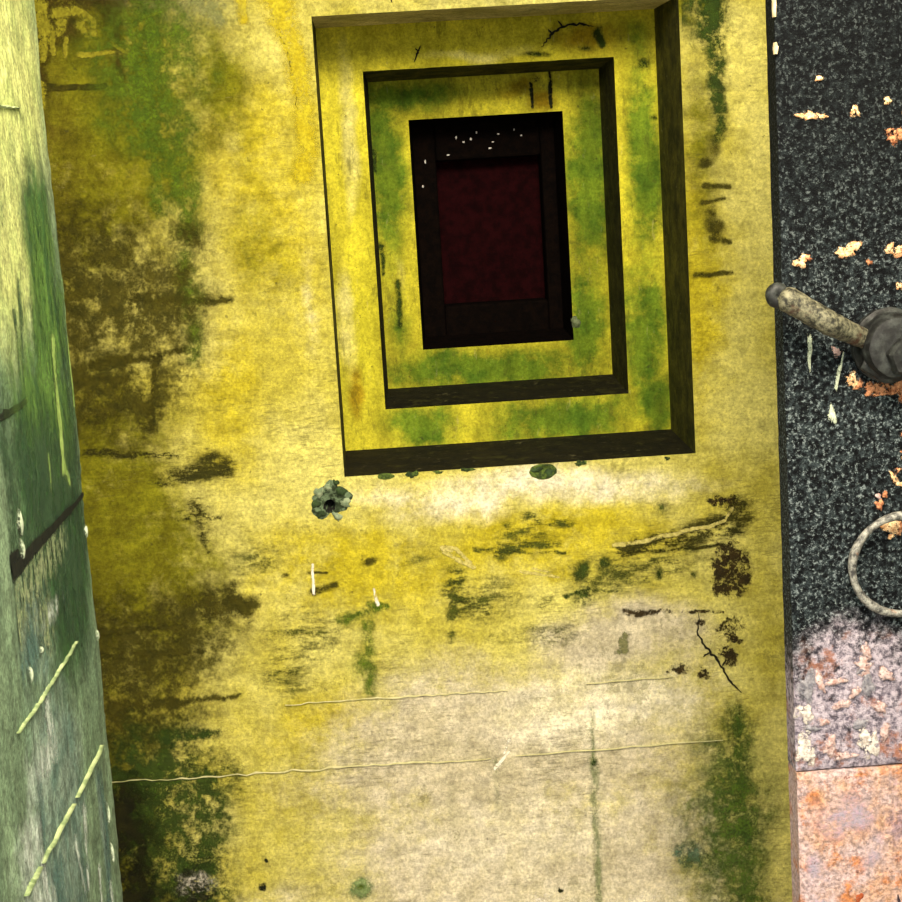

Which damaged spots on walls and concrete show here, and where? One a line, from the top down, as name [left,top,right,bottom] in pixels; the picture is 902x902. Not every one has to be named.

crack [541,21,594,47]
peeling [794,110,829,120]
peeling [792,254,812,268]
peeling [835,241,862,258]
peeling [885,243,902,258]
damp [57,200,236,487]
damp [473,512,574,561]
damp [93,582,260,759]
damp [622,608,745,667]
crack [696,613,742,693]
peeling [793,642,895,766]
damp [74,771,217,902]